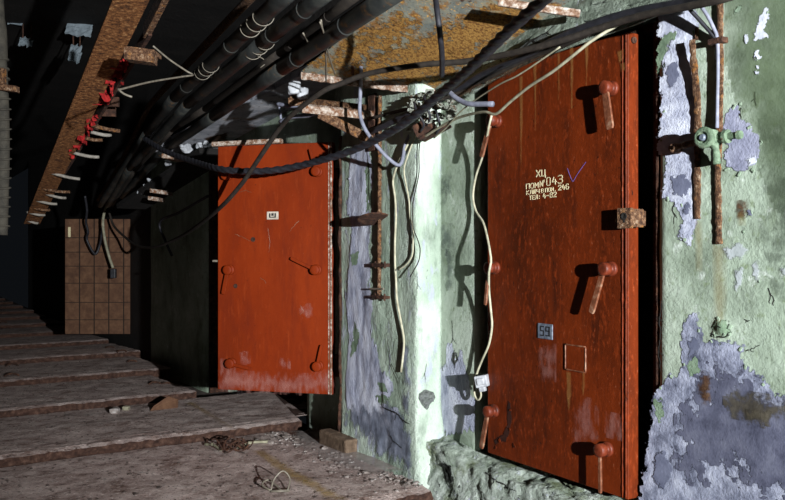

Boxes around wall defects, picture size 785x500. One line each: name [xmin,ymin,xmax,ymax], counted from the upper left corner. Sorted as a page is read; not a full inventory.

corrosion [308,4,520,86]
corrosion [513,17,538,37]
peeling [656,9,701,246]
corrosion [689,39,702,135]
corrosion [693,146,702,219]
corrosion [714,142,723,244]
corrosion [716,3,724,132]
peeling [723,102,763,177]
peeling [744,7,770,74]
peeling [345,148,399,425]
peeling [419,343,476,436]
peeling [638,312,785,500]